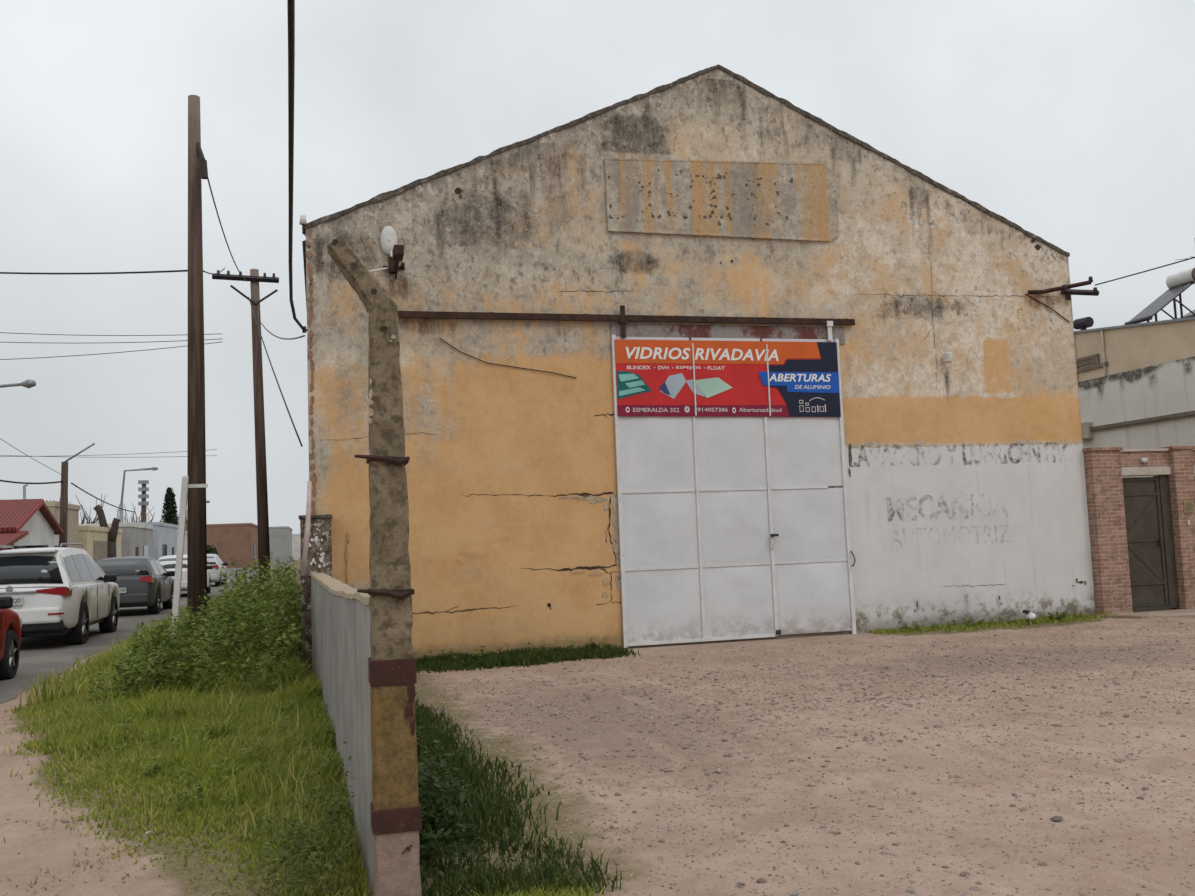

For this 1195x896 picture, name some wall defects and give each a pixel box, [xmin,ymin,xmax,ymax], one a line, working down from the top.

crack [469,492,622,605]
crack [413,606,511,614]